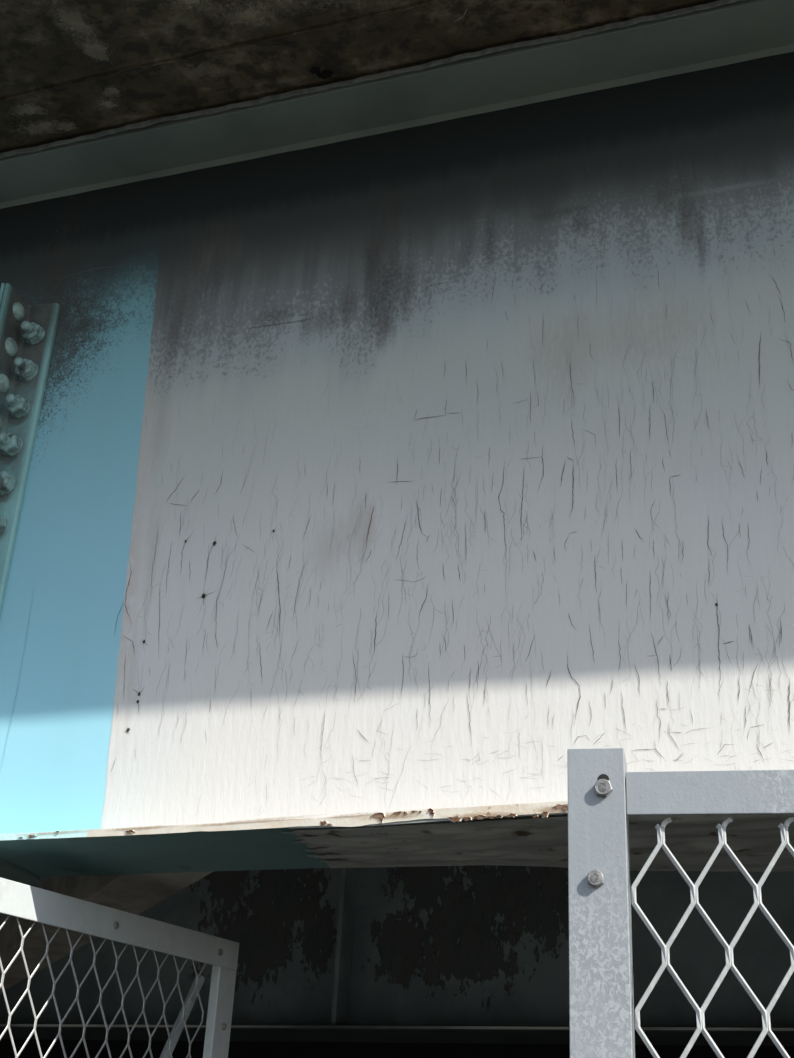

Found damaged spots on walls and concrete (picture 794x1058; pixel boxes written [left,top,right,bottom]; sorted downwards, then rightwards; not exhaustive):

crack [111,243,794,816]